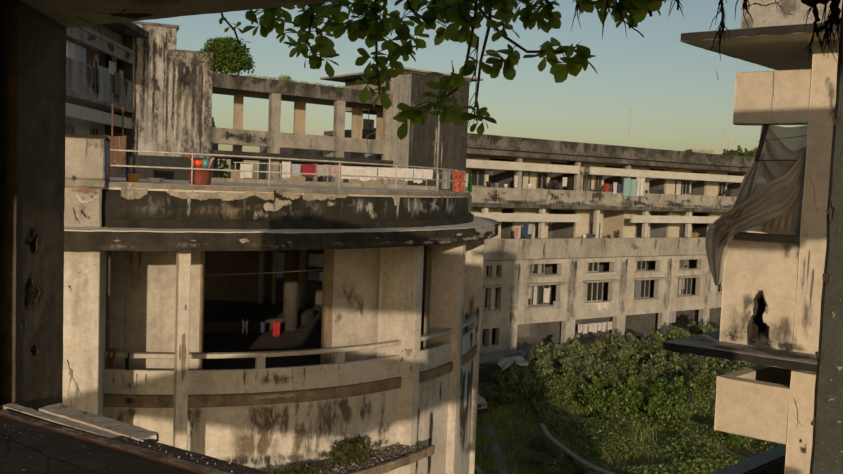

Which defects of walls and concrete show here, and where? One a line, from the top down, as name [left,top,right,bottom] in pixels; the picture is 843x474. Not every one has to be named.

water stain [115,31,203,156]
flaking render [167,189,348,216]
water stain [461,298,479,353]
spalling [752,294,769,340]
water stain [225,407,331,466]
water stain [309,400,350,434]
water stain [460,361,473,447]